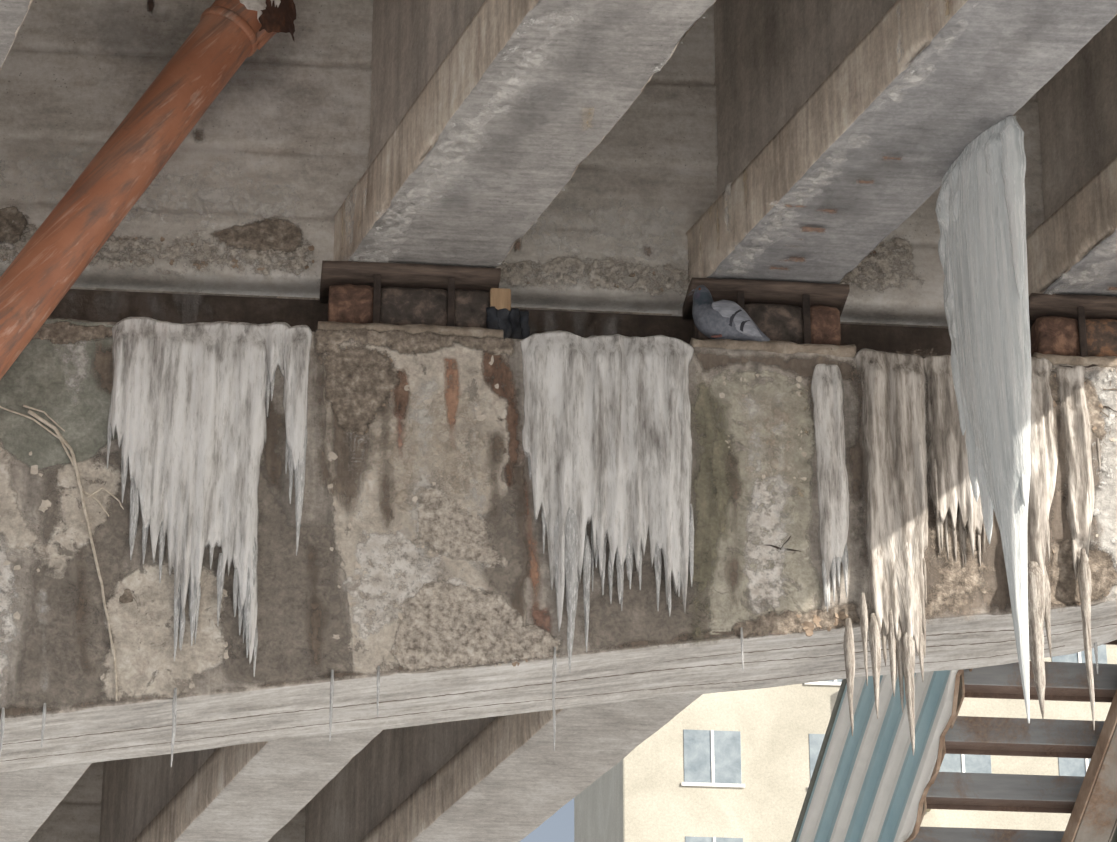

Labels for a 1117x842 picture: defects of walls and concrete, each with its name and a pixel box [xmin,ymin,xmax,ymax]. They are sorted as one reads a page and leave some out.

corrosion [258,0,296,41]
spalling [0,207,36,263]
spalling [91,218,314,278]
spalling [497,257,690,296]
spalling [841,237,924,291]
corrosion [393,370,409,449]
corrosion [444,358,459,425]
crack [1059,364,1117,446]